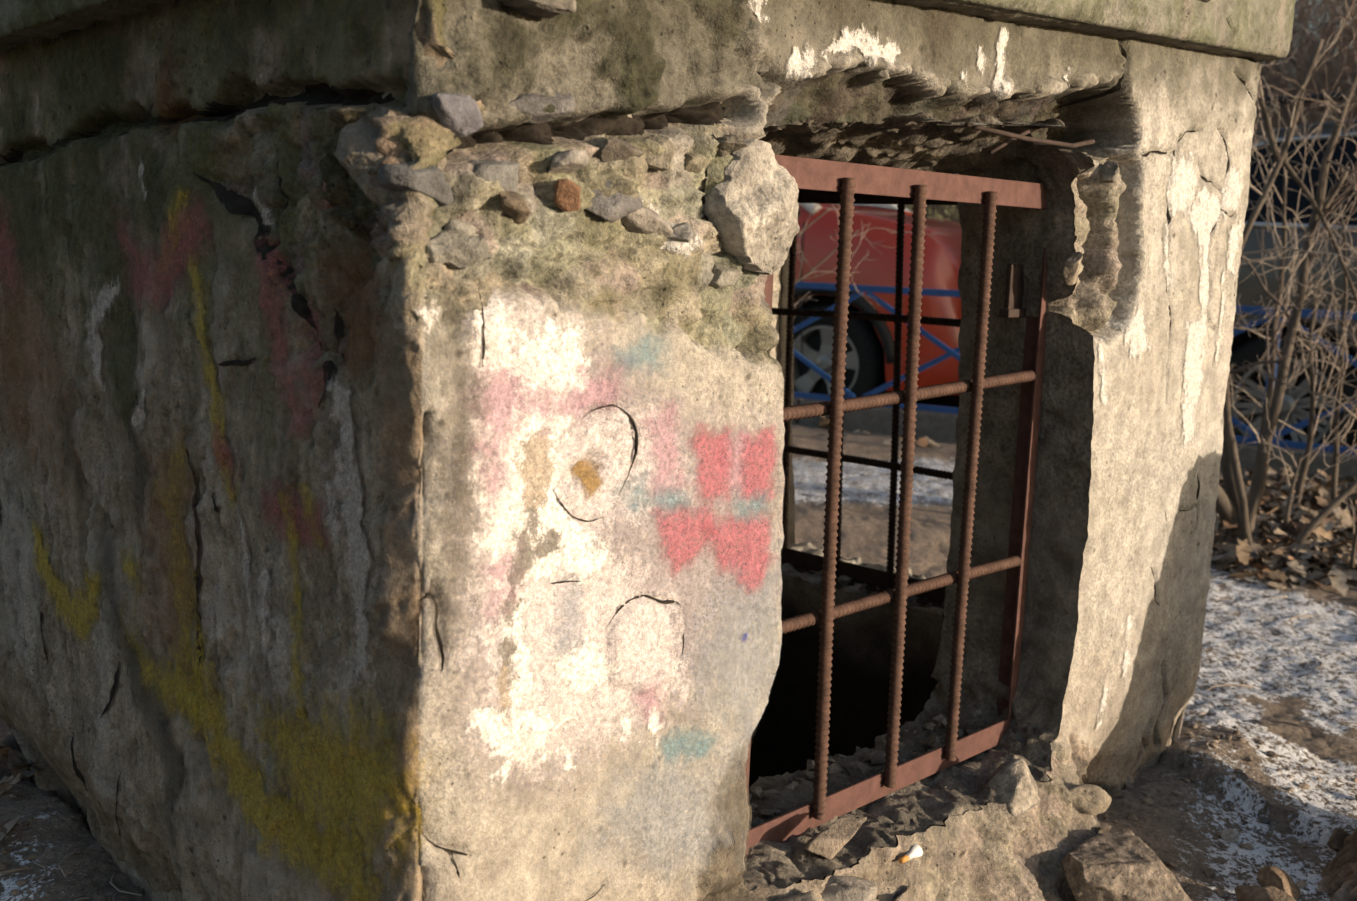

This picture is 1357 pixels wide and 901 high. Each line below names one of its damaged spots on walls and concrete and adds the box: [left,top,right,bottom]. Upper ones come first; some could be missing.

crack [446,102,727,240]
crack [1141,128,1235,265]
spalling [208,0,1140,784]
crack [552,404,639,522]
crack [420,579,445,672]
crack [605,595,684,658]